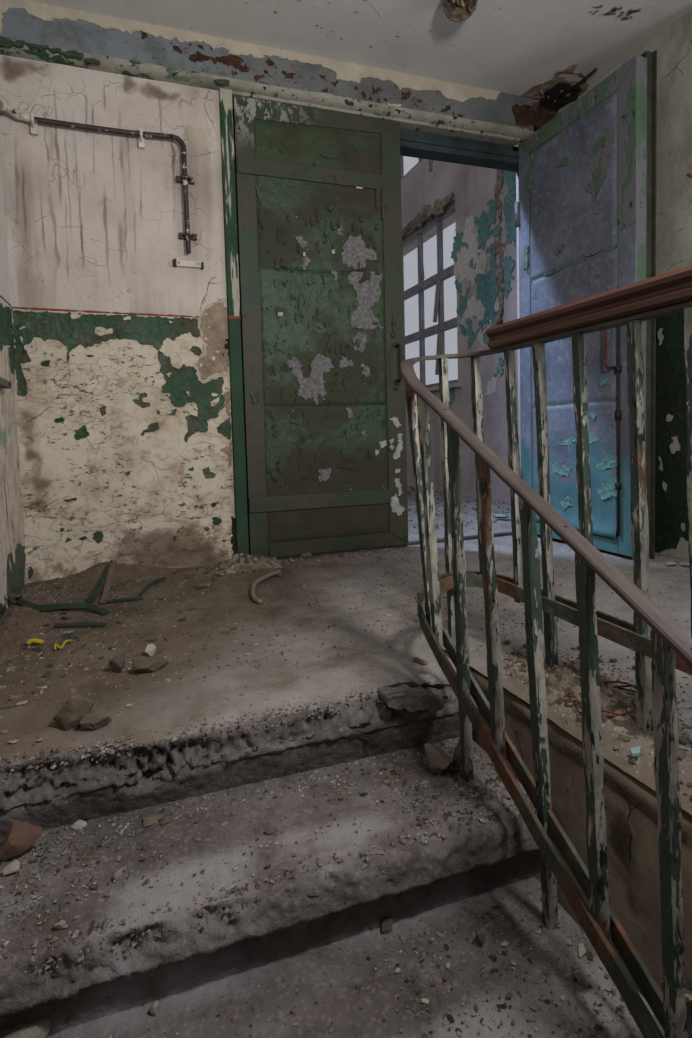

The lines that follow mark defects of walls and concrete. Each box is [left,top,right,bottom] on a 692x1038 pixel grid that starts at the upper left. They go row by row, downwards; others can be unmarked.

corrosion [172,44,300,96]
flaking render [0,0,501,103]
corrosion [319,74,423,118]
spalling [520,63,597,113]
flaking render [451,135,538,396]
peeling [288,226,384,405]
peeling [0,298,233,468]
peeling [0,543,34,618]
peeling [65,531,103,544]
leakage [124,533,226,568]
spalling [0,676,452,777]
crack [604,775,657,870]